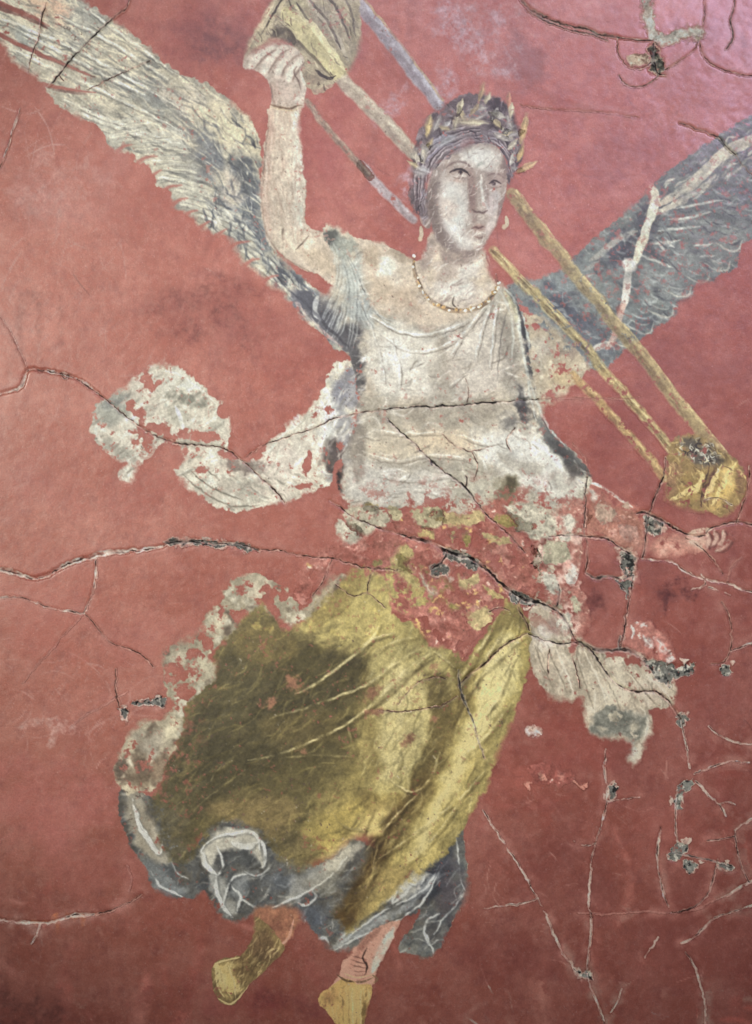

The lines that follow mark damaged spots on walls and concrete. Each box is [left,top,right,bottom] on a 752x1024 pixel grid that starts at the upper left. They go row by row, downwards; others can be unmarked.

crack [27,0,152,91]
crack [519,0,752,88]
spalling [626,0,709,77]
crack [678,122,752,177]
crack [0,315,641,554]
peeling [291,487,669,660]
crack [0,539,399,728]
peeling [621,619,696,690]
spalling [117,694,167,725]
crack [328,441,752,1024]
spalling [666,837,705,875]
crack [0,864,143,945]